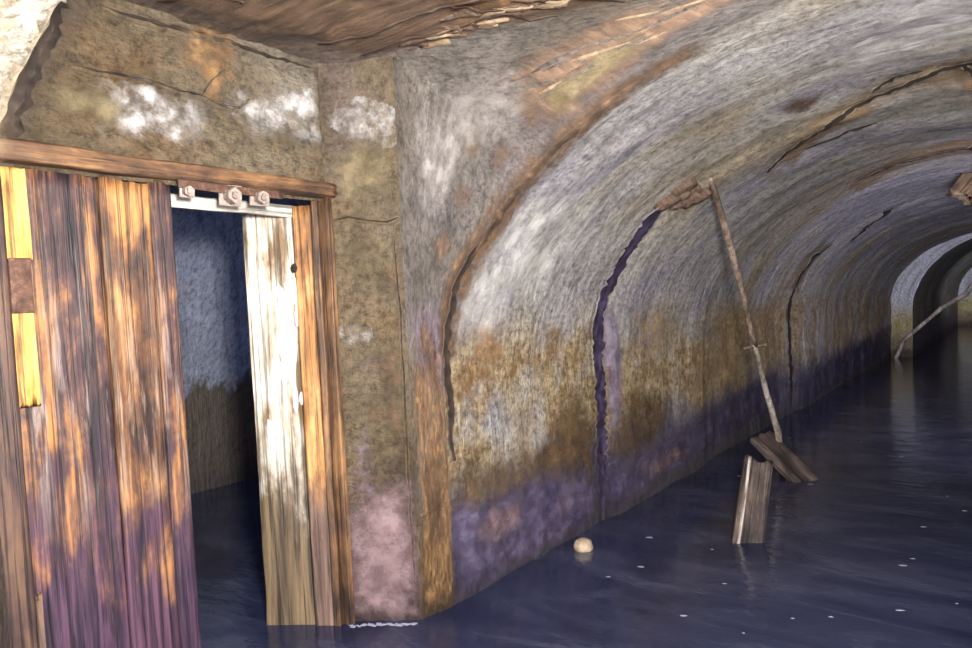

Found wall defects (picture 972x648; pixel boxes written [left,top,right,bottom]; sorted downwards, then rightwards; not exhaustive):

crack [0,0,627,138]
spalling [196,0,599,53]
spalling [494,0,728,123]
crack [765,62,972,173]
crack [852,145,972,185]
corrosion [416,48,693,603]
crack [590,194,683,521]
damp [603,306,780,499]
damp [799,327,891,404]
damp [456,400,594,583]
damp [353,497,410,611]